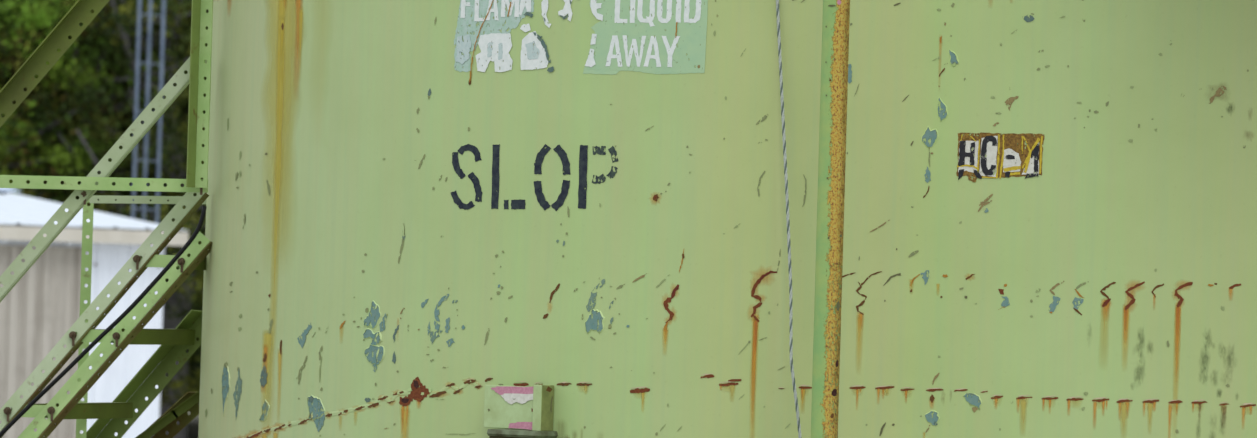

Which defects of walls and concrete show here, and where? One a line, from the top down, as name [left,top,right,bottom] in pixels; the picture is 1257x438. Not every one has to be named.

peeling [933,3,960,67]
rust [270,0,302,243]
rust [799,0,1256,438]
peeling [574,277,629,340]
peeling [353,288,465,402]
peeling [211,362,242,417]
peeling [259,365,270,422]
peeling [296,323,327,437]
rust [247,376,592,438]
rust [701,373,741,395]